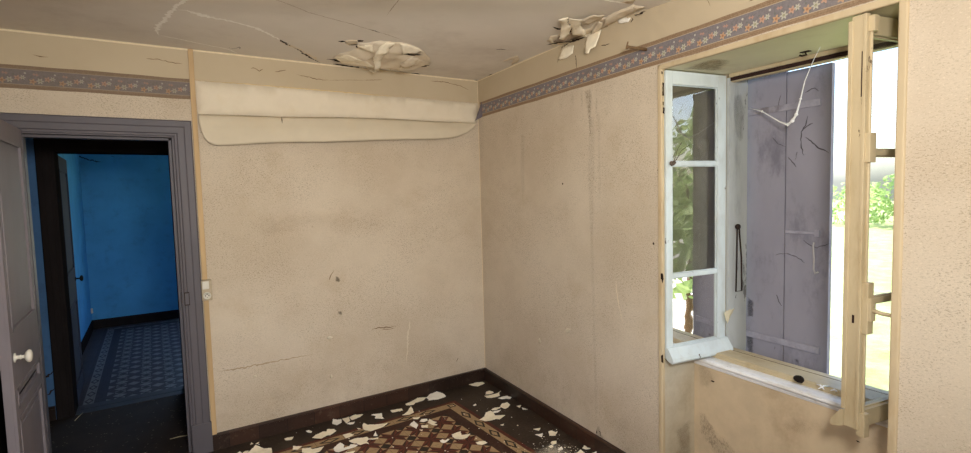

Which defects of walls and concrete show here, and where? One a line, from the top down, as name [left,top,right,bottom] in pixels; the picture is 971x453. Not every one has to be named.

crack [605,0,635,8]
crack [148,0,322,80]
peeling [329,40,430,74]
peeling [547,5,645,68]